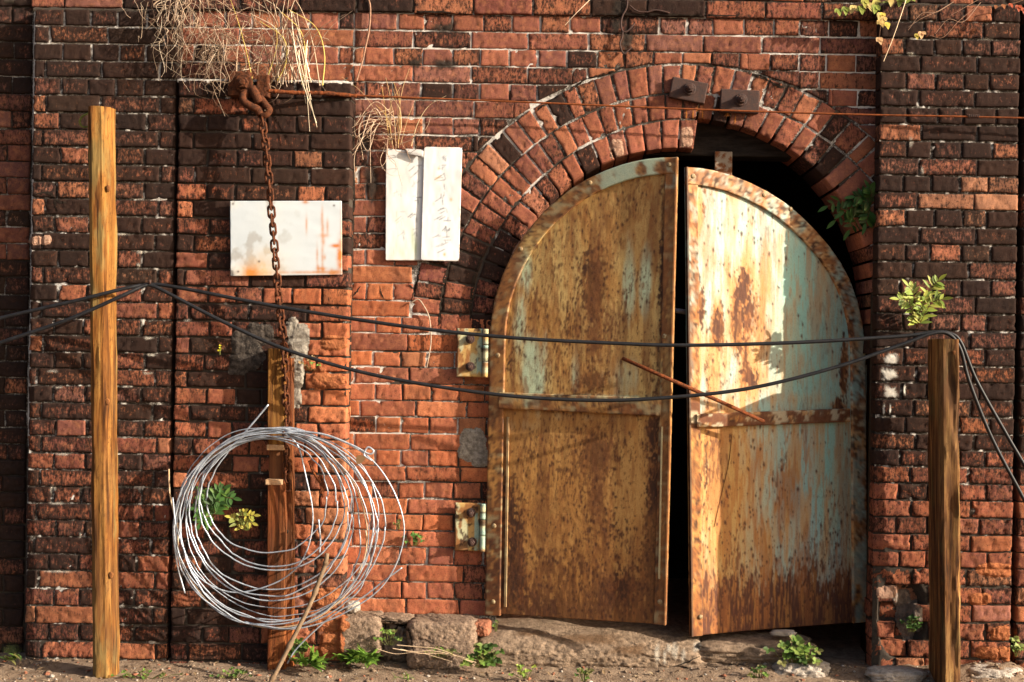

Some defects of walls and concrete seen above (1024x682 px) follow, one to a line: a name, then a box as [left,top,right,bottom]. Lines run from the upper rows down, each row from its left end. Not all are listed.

spalling [228,317,349,408]
peeling [457,427,488,467]